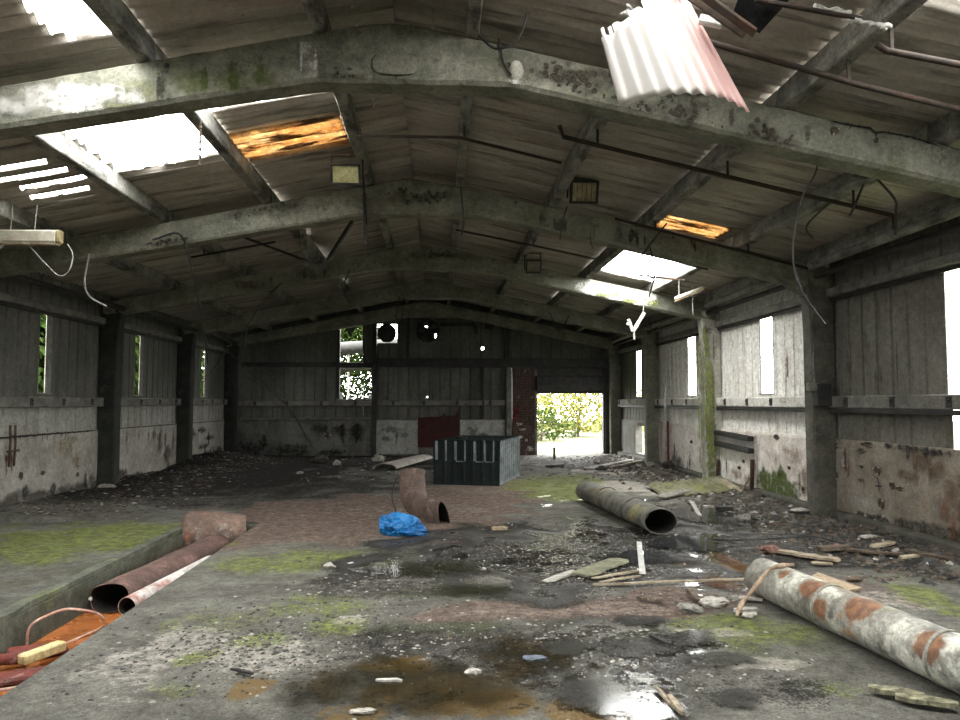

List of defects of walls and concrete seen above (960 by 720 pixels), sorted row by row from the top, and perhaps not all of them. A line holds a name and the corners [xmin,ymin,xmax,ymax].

spalling [529,61,617,99]
spalling [629,94,695,123]
spalling [748,117,794,145]
damp [236,423,363,456]